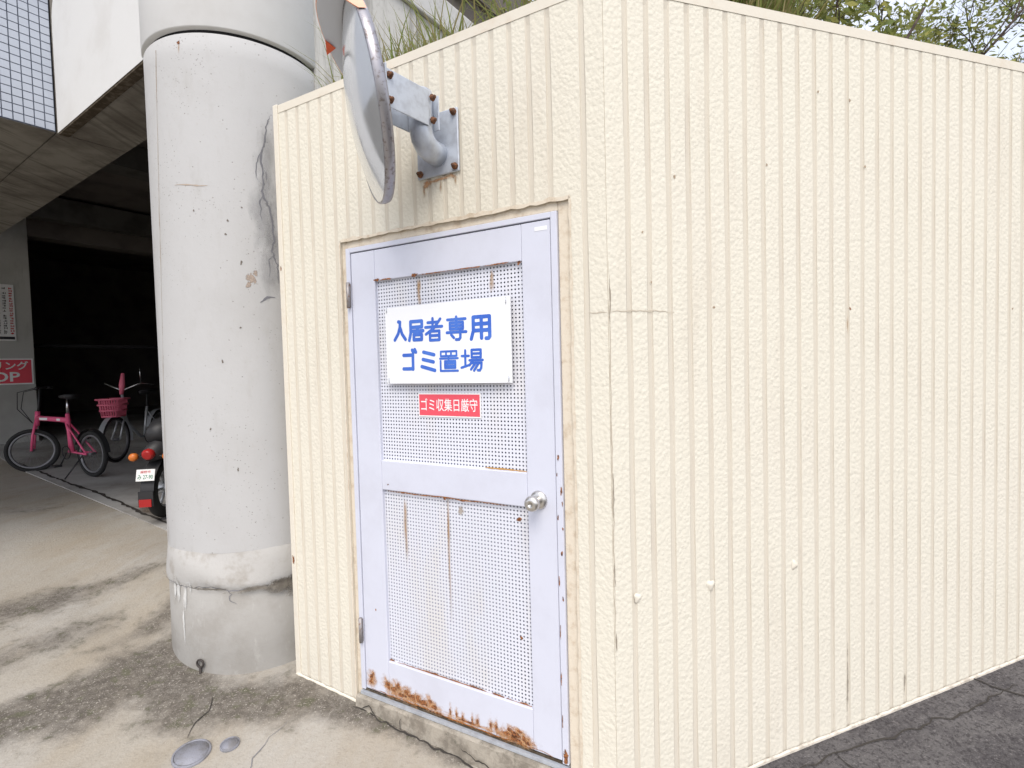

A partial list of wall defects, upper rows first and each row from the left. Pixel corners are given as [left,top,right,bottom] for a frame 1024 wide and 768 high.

crack [255,118,279,284]
spalling [240,260,258,288]
rust [411,261,522,298]
damp [174,580,225,637]
crack [169,577,291,603]
damp [239,576,293,593]
rust [390,659,532,707]
rust [369,672,568,764]